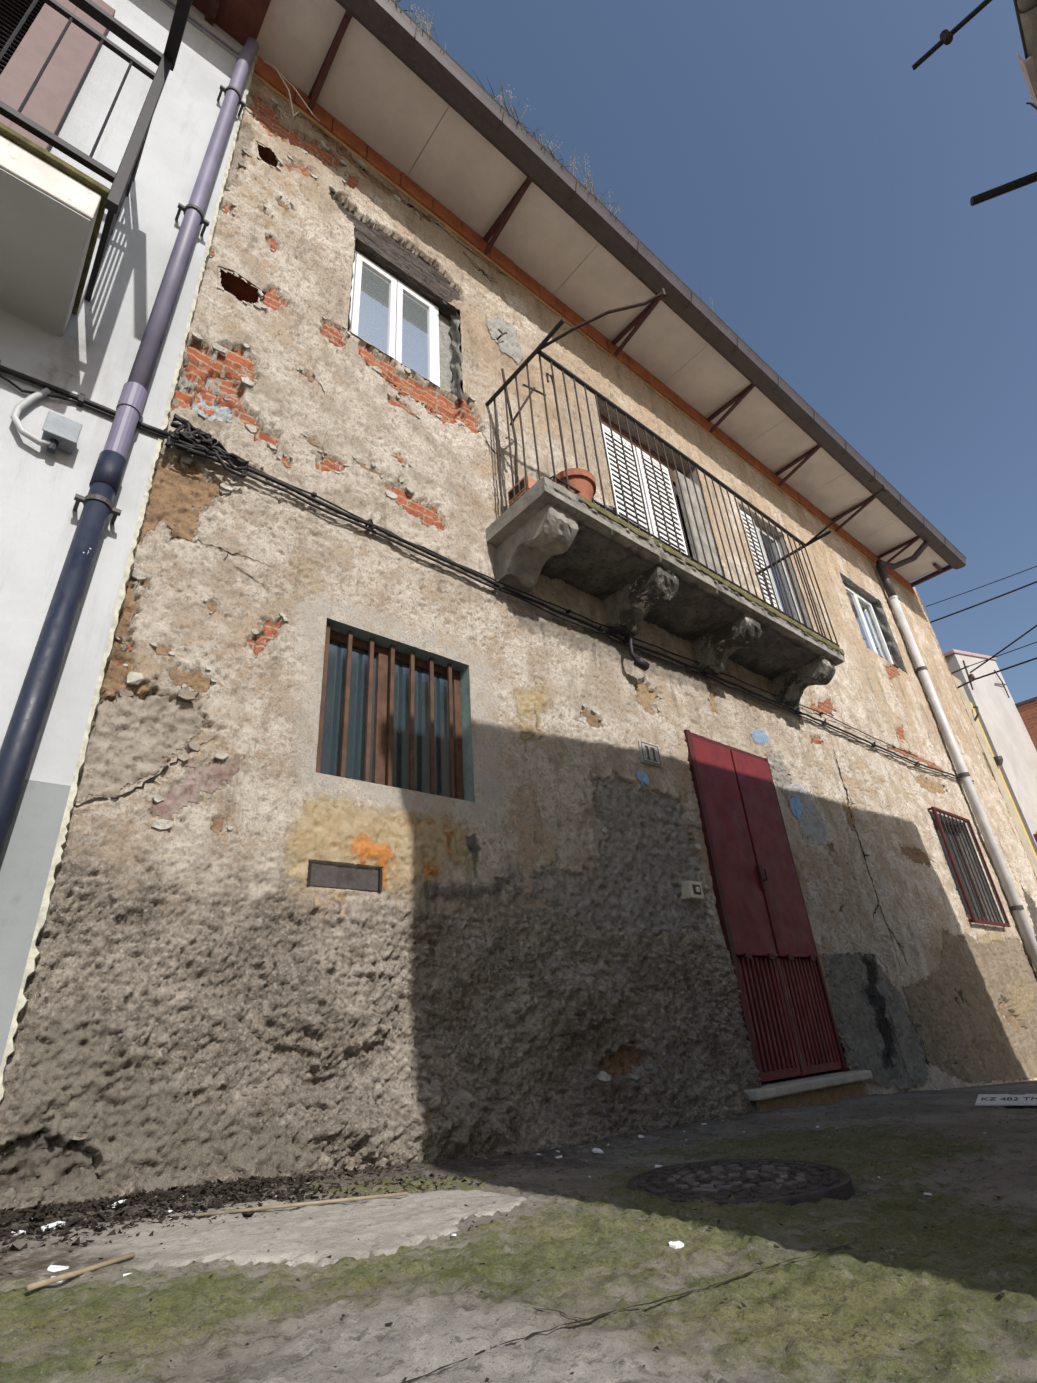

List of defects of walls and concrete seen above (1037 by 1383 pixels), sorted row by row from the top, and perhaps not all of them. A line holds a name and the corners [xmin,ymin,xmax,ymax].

spalling [221,96,434,222]
spalling [209,240,288,311]
spalling [172,333,293,486]
spalling [320,316,483,434]
spalling [303,434,445,531]
spalling [247,613,289,658]
crack [74,742,207,807]
spalling [210,818,233,834]
corrosion [285,792,468,919]
spalling [531,773,714,937]
peeling [597,1071,611,1081]
peeling [72,1132,90,1140]